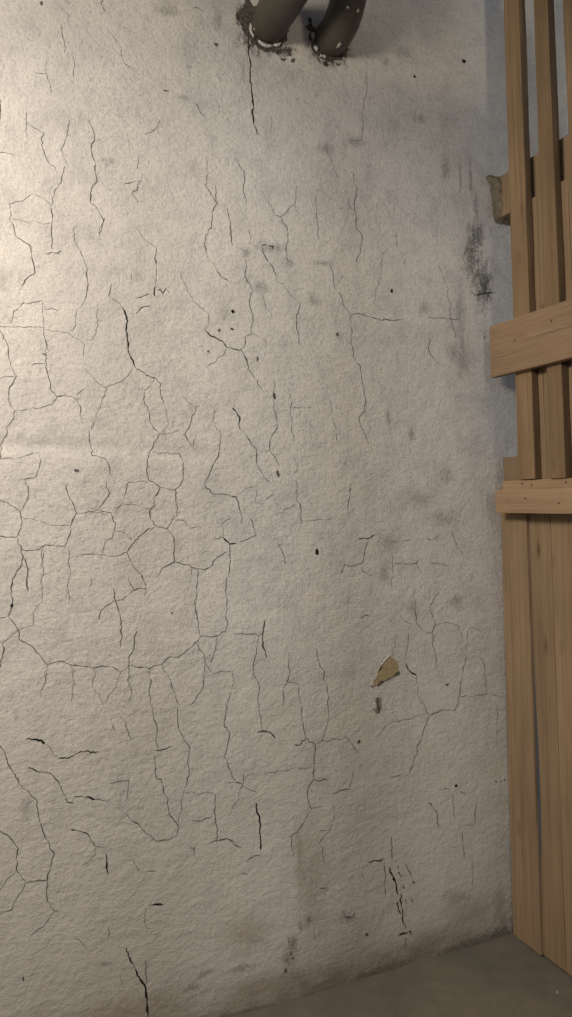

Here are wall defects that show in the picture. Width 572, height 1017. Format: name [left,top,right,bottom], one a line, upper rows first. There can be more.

crack [196,37,272,132]
crack [326,148,397,444]
crack [424,266,495,369]
crack [0,112,357,935]
flaking render [371,655,400,714]
crack [342,531,502,777]
crack [429,788,477,886]
crack [362,837,415,946]
crack [107,926,149,1015]